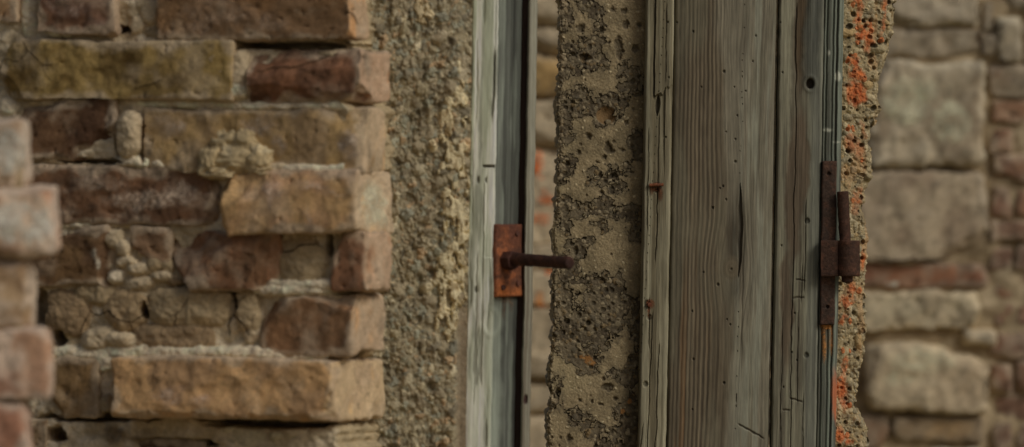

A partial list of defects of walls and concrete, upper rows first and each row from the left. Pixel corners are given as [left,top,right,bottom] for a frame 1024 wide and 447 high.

spalling [536,0,644,447]